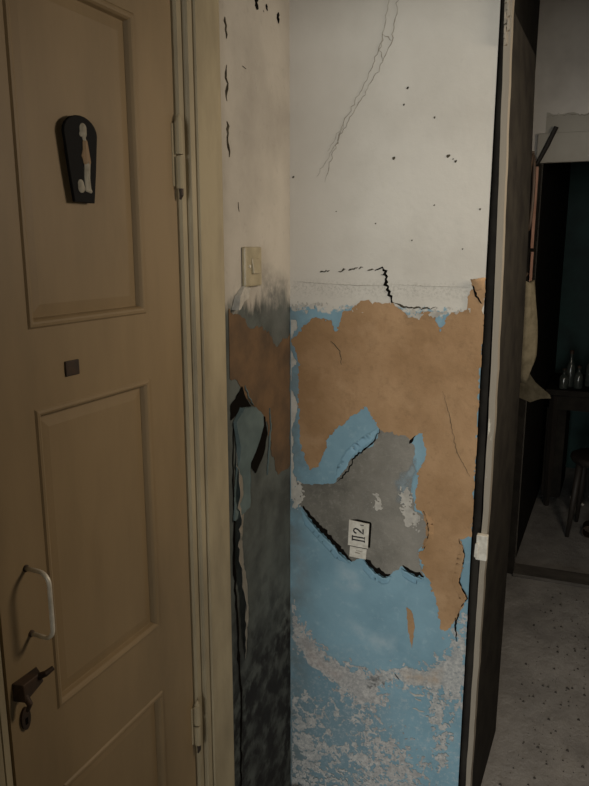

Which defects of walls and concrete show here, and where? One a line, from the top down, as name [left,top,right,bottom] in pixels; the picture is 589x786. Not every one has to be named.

crack [318,1,398,179]
crack [305,266,449,310]
peeling [228,278,486,786]